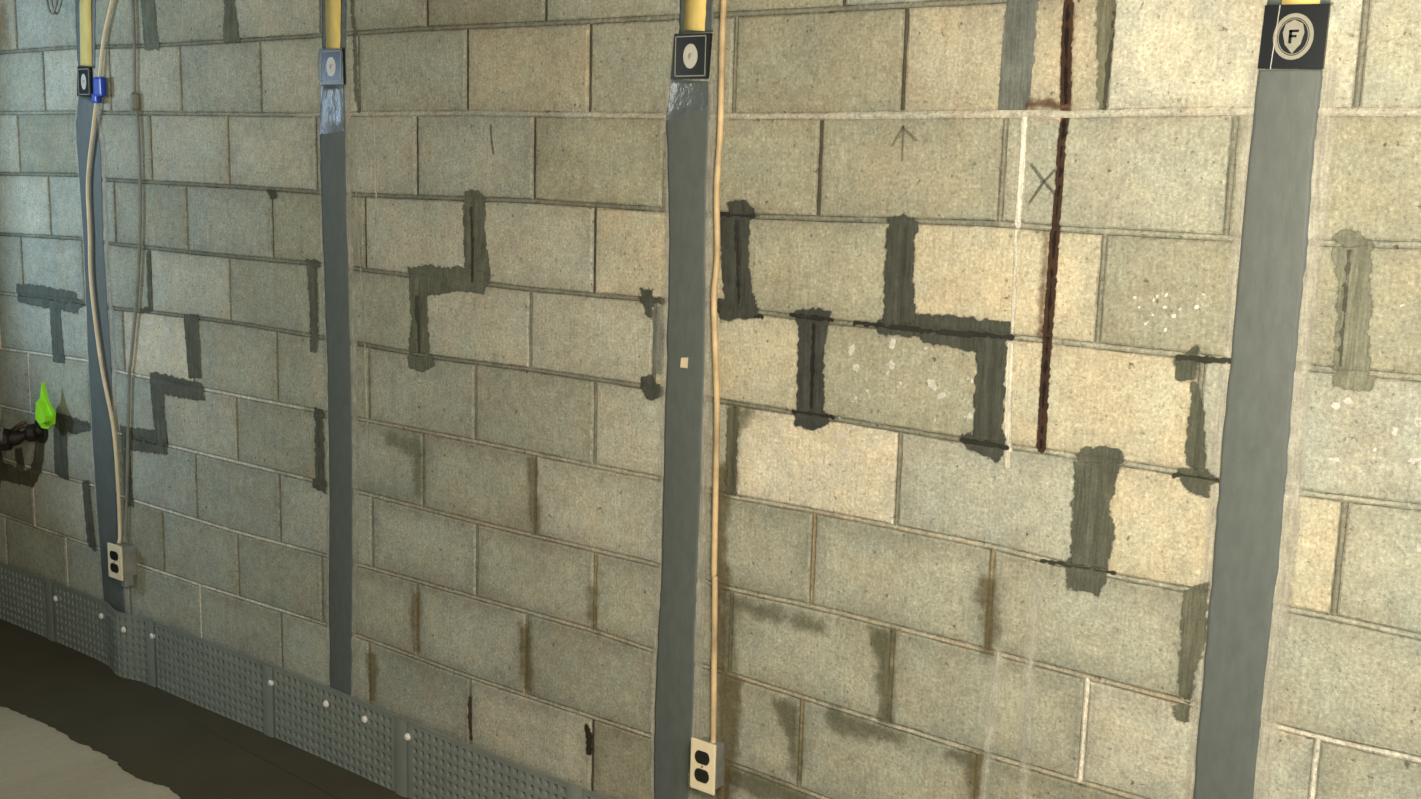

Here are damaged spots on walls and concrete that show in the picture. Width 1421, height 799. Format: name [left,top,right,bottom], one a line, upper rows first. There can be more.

crack [717,0,1116,453]